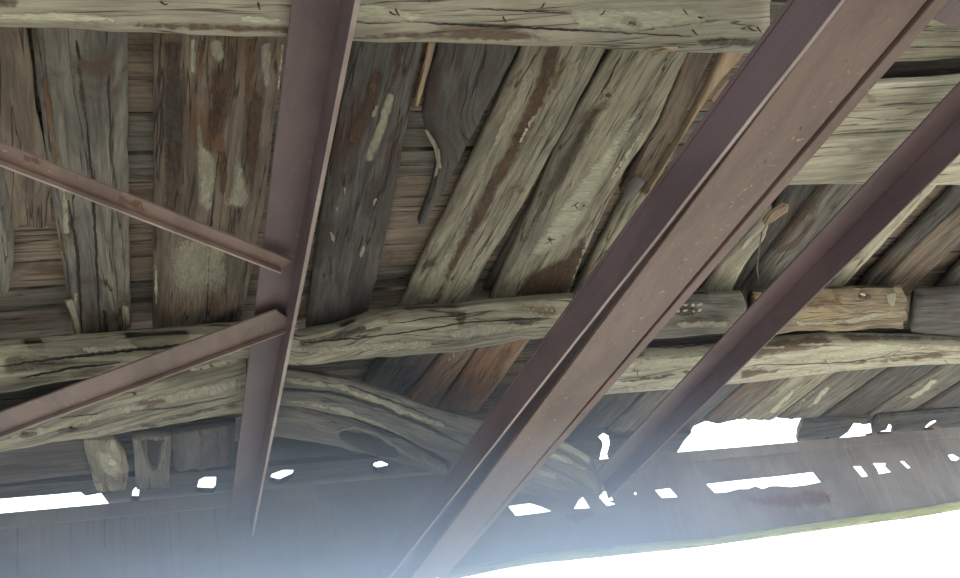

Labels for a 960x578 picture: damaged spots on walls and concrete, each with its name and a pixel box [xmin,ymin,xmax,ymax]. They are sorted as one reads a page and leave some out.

leakage [210,49,236,138]
leakage [247,91,262,183]
leakage [219,151,227,194]
crack [303,314,534,343]
crack [0,344,179,379]